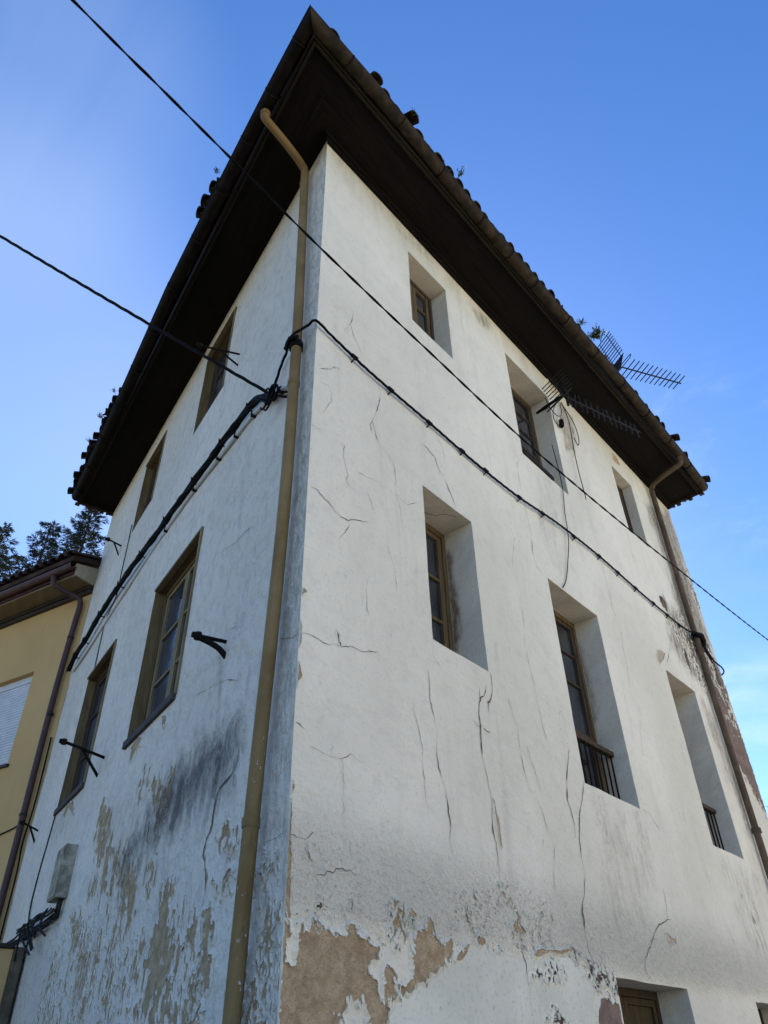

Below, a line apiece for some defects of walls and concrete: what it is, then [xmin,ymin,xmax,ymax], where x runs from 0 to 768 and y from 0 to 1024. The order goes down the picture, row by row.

crack [310,438,456,585]
leakage [649,508,718,697]
flaking render [34,734,242,1024]
leakage [124,739,227,863]
crack [195,748,239,986]
flaking render [241,778,623,1024]
crack [475,677,512,888]
crack [518,651,591,955]
crack [645,890,669,979]